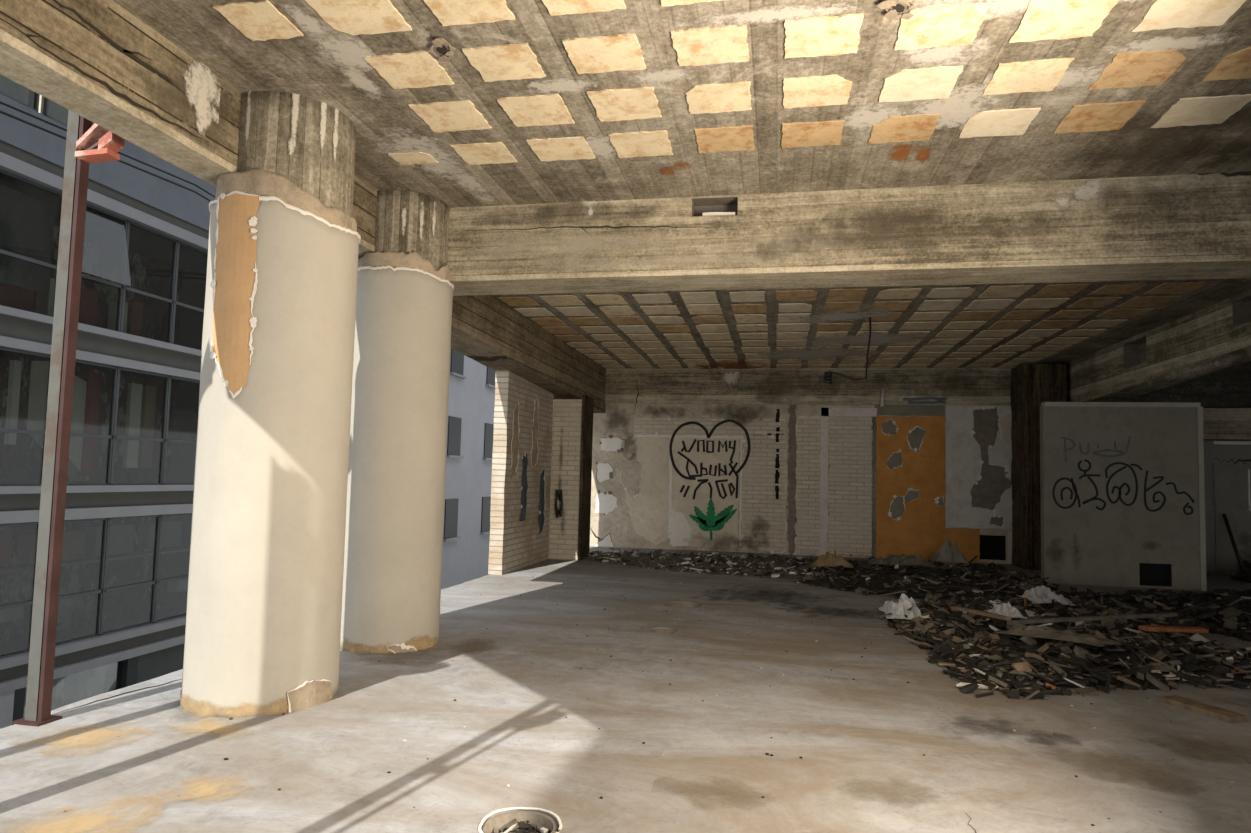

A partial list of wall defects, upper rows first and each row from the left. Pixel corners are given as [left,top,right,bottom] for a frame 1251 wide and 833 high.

water stain [535,201,604,219]
water stain [1055,179,1170,210]
spalling [358,265,454,290]
peeling [209,191,361,399]
peeling [871,418,927,470]
peeling [970,406,1012,528]
peeling [888,488,919,520]